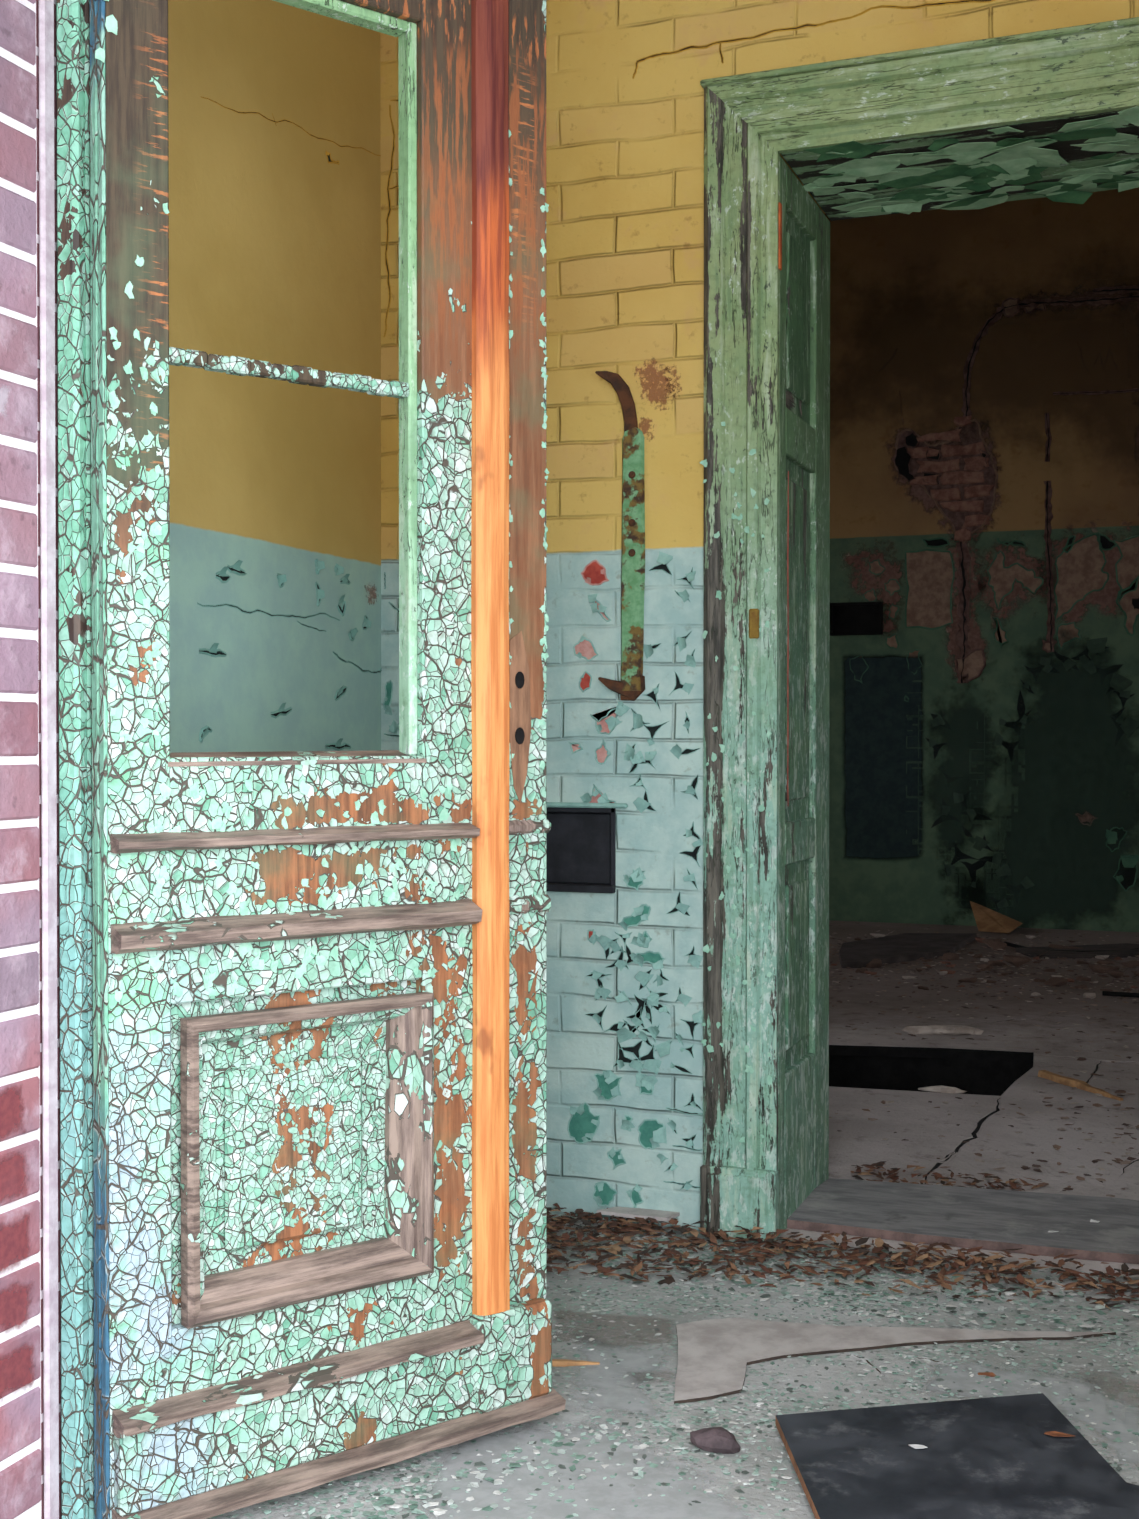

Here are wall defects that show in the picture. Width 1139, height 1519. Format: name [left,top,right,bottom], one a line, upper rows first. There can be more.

peeling [95,0,118,63]
crack [632,0,995,79]
peeling [803,106,1139,217]
peeling [124,255,144,299]
peeling [109,327,156,380]
rust [634,358,681,440]
spalling [581,560,611,622]
leakage [843,422,1139,930]
spalling [568,630,725,813]
peeling [293,800,407,912]
peeling [567,822,723,1144]
crack [923,1097,1002,1184]